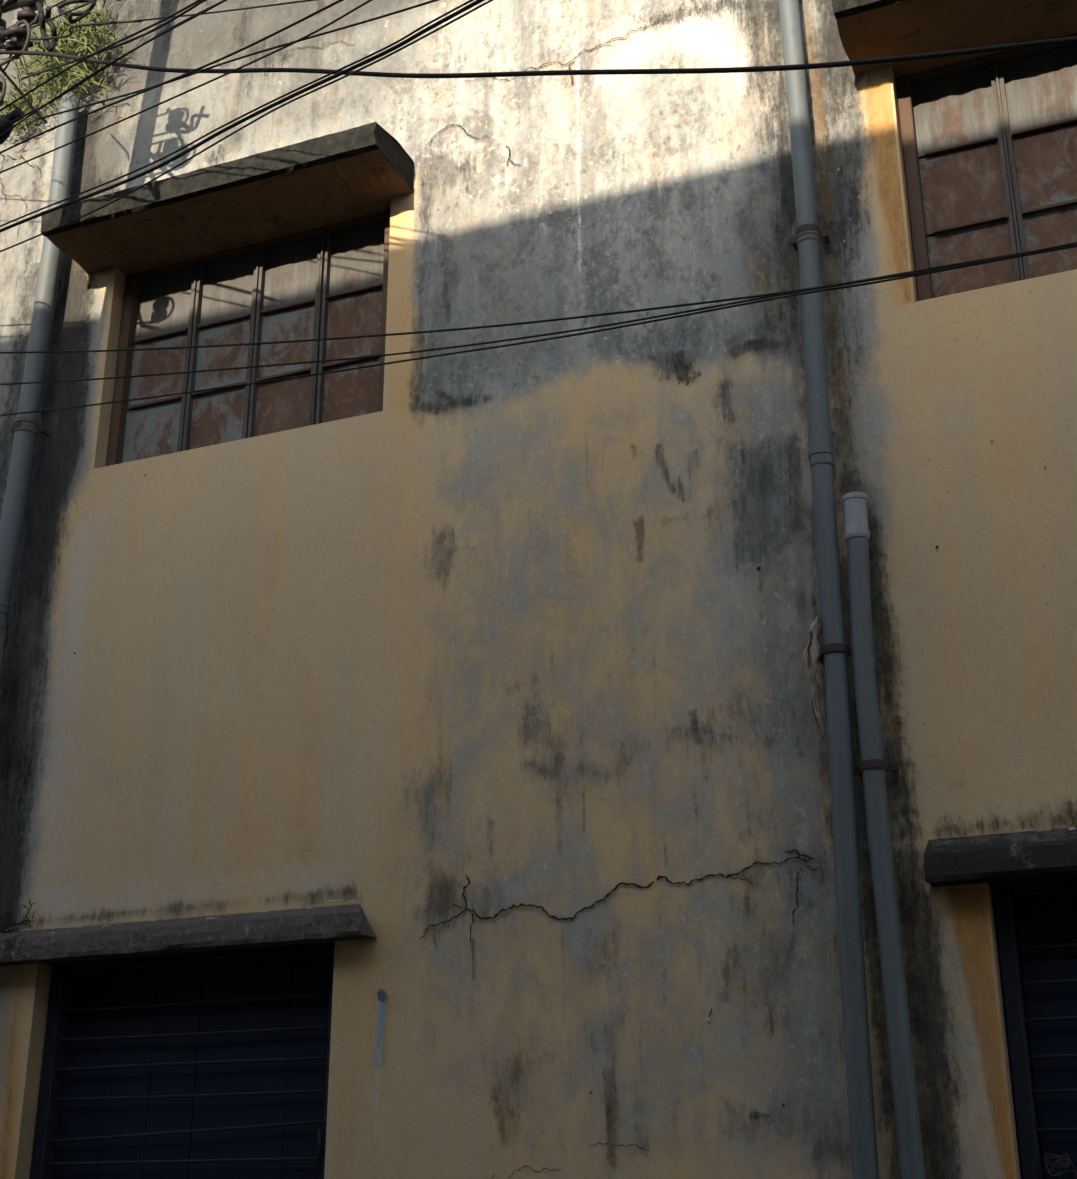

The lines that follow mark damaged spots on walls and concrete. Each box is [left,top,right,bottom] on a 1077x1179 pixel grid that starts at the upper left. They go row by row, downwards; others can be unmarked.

water stain [69,112,121,202]
water stain [595,0,802,358]
water stain [651,350,701,385]
water stain [0,251,93,934]
crack [419,849,819,943]
water stain [847,656,898,1175]
water stain [868,516,961,1179]